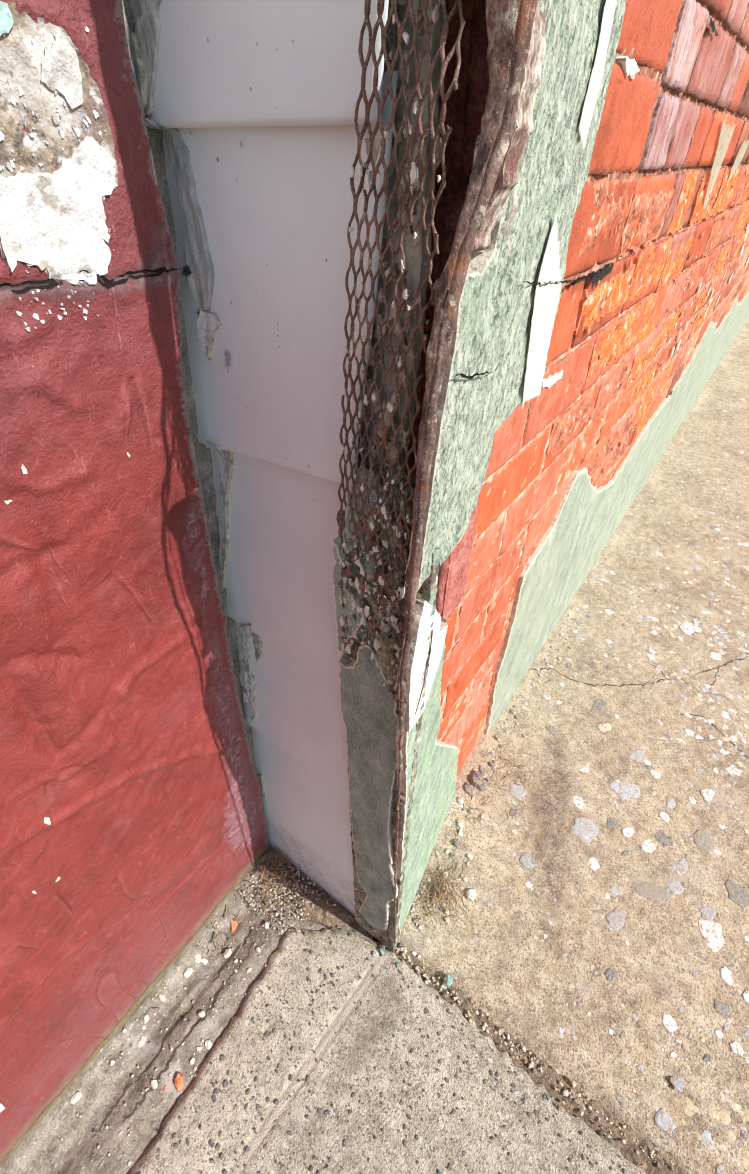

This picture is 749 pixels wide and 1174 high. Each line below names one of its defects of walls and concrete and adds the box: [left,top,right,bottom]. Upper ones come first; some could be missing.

peeling [579,0,617,149]
peeling [0,1,118,332]
spalling [349,162,371,190]
spalling [383,129,421,204]
crack [0,238,182,293]
spalling [392,288,412,335]
spalling [398,229,421,274]
peeling [523,214,564,403]
crack [523,263,614,289]
spalling [544,164,749,486]
spalling [338,356,448,732]
crack [528,654,749,758]